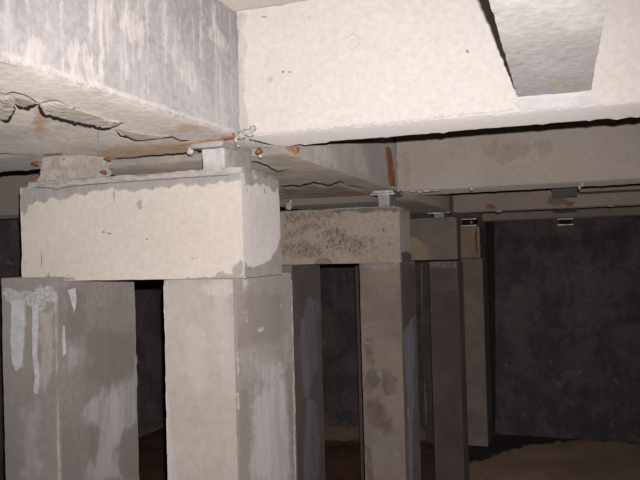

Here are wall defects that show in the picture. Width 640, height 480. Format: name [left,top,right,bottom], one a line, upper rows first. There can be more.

crack [1,91,202,159]
rust [179,132,235,146]
crack [251,161,363,193]
rust [386,147,396,187]
leakage [2,285,57,395]
leakage [62,288,83,365]
leakage [85,332,176,480]
leakage [237,364,296,480]